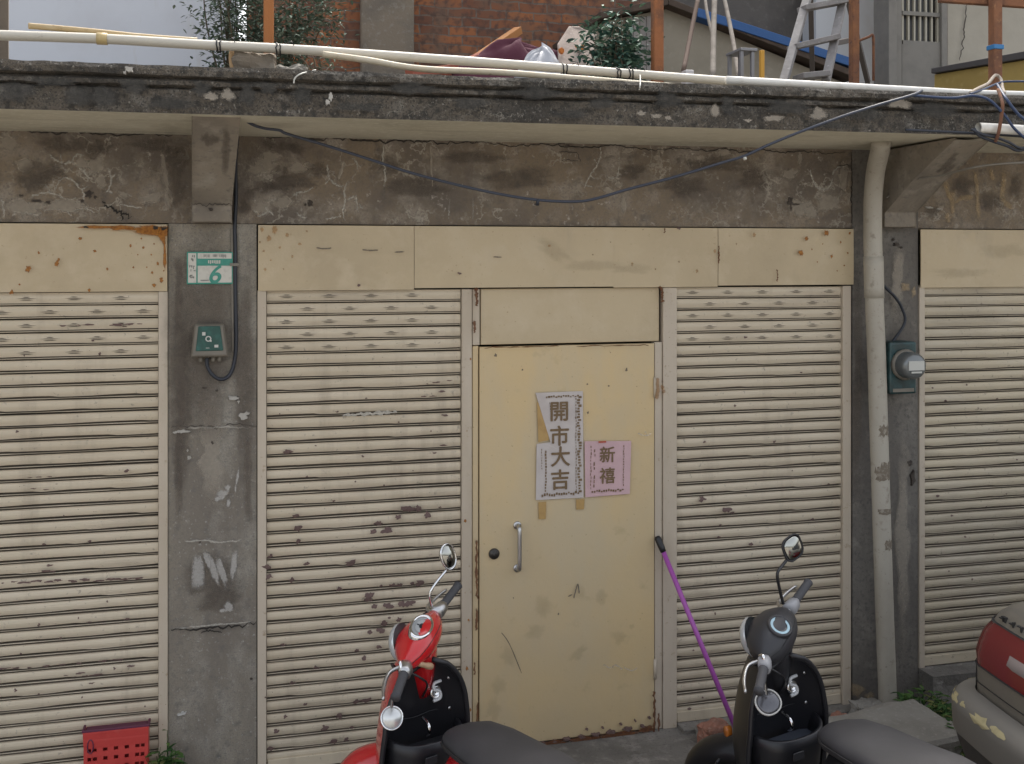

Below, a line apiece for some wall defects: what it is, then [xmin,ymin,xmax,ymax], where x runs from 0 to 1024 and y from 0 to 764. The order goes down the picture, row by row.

crack [266,137,853,223]
crack [102,201,132,221]
rust [78,225,168,287]
crack [171,422,257,430]
peeling [215,471,239,506]
peeling [192,541,237,586]
crack [171,622,256,633]
rust [544,691,660,745]